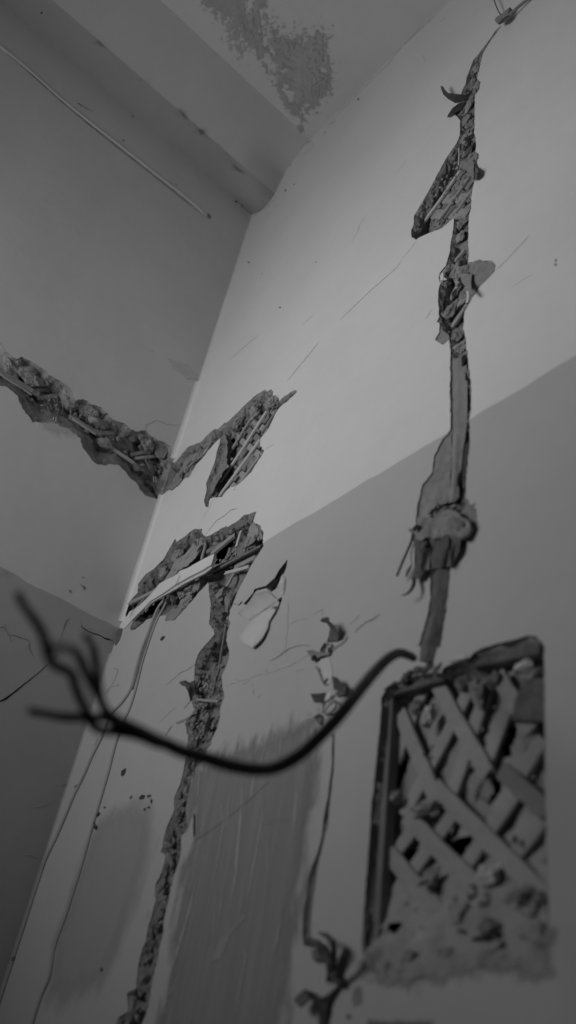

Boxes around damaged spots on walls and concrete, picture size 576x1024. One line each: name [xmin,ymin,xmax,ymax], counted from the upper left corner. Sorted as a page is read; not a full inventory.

peeling [200,0,341,133]
flaking render [0,342,297,507]
spalling [362,26,537,955]
flaking render [114,512,288,751]
flaking render [117,617,348,1024]